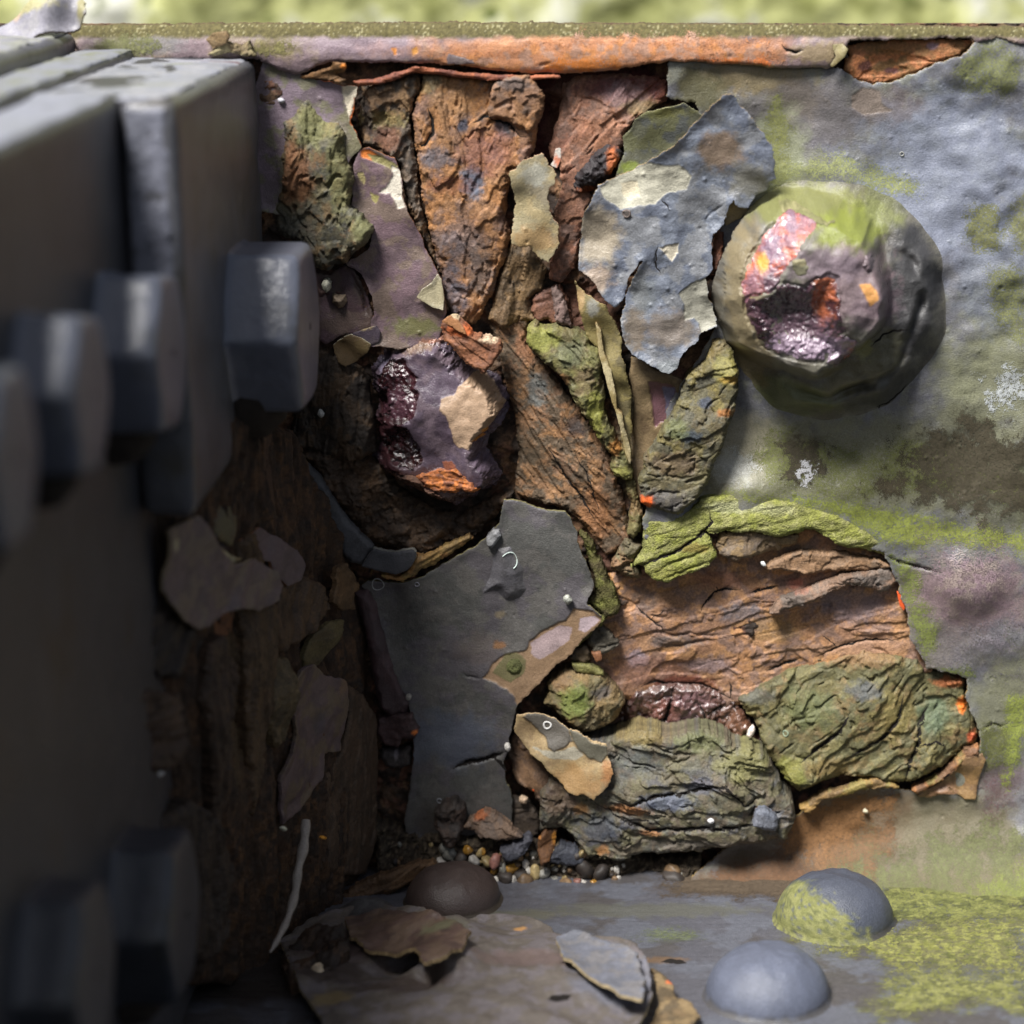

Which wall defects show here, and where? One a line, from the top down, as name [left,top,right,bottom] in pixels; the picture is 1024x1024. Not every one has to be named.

corrosion [248,59,282,104]
corrosion [301,22,785,221]
corrosion [262,212,297,242]
corrosion [314,234,374,316]
peeling [206,31,503,502]
peeling [509,148,561,262]
peeling [531,94,776,539]
corrosion [394,171,933,742]
corrosion [150,334,502,986]
peeling [514,712,613,800]
peeling [570,624,619,676]
spalling [618,682,761,740]